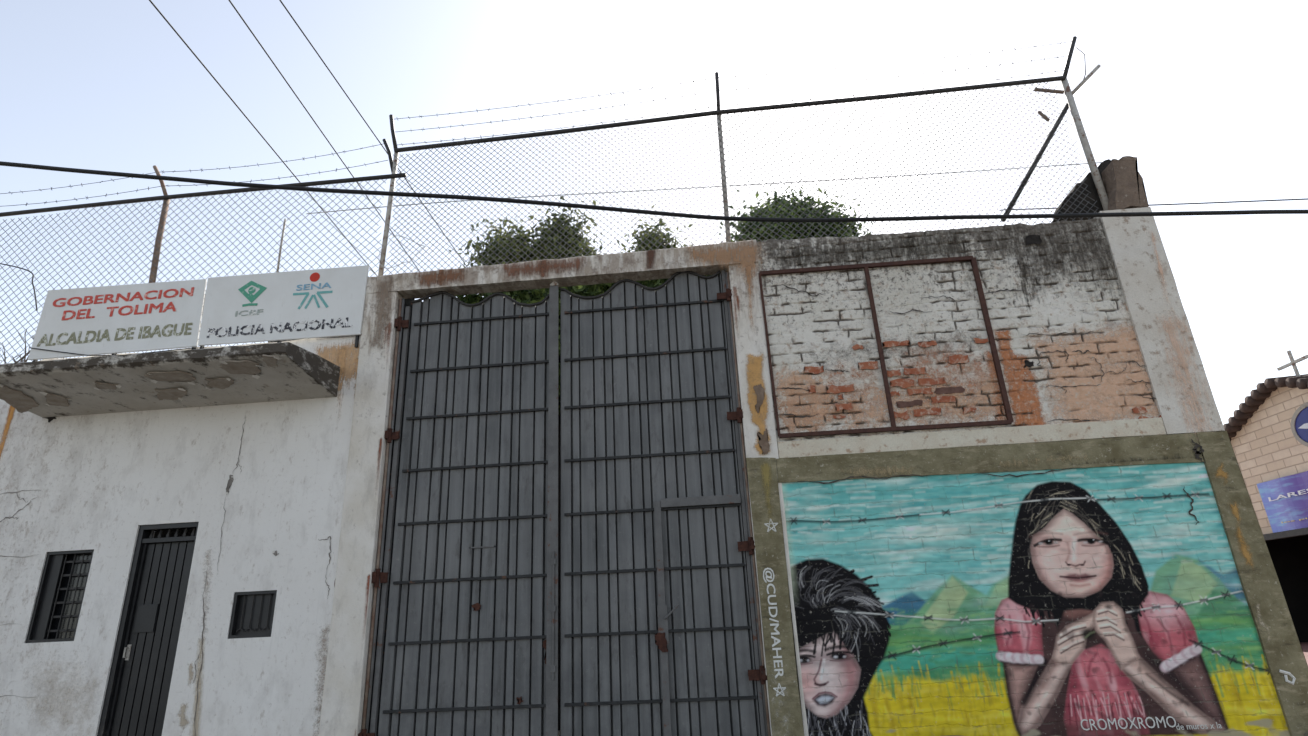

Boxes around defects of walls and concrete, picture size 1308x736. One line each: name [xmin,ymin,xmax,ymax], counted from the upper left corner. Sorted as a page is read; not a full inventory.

water stain [692,236,969,321]
water stain [988,227,1119,301]
peeling [0,383,72,422]
peeling [144,354,281,401]
peeling [747,325,1161,454]
rust [0,406,15,456]
crack [0,490,37,522]
crack [193,502,226,736]
rust [655,632,668,652]